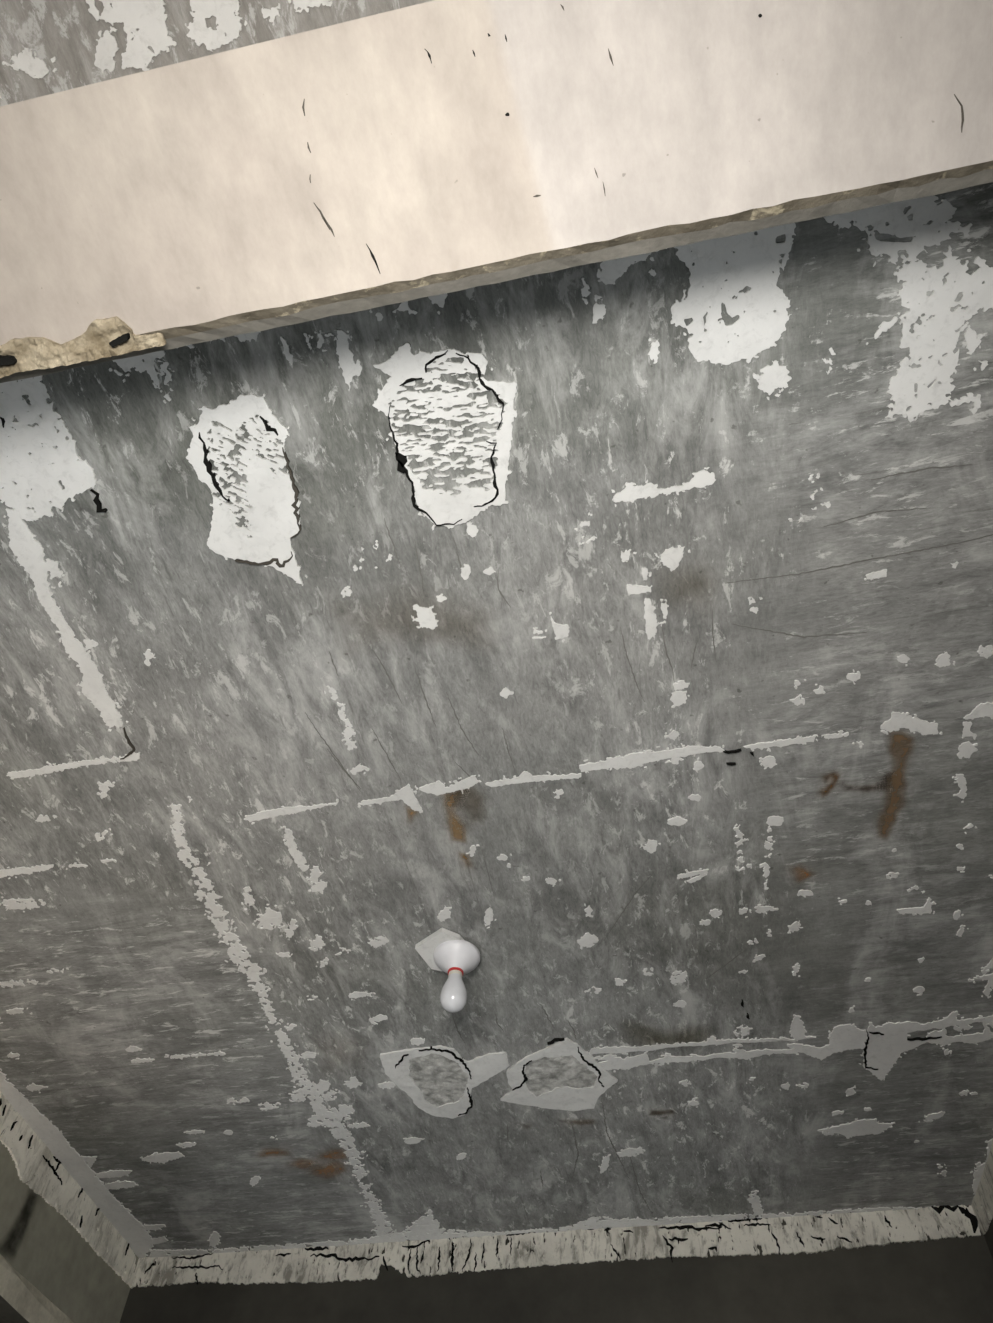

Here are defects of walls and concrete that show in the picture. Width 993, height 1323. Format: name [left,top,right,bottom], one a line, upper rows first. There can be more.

peeling [86,0,248,73]
peeling [670,223,796,400]
peeling [824,195,993,422]
peeling [0,316,175,527]
peeling [186,393,308,586]
peeling [303,329,517,537]
corrosion [445,792,468,860]
corrosion [821,733,912,837]
crack [0,1098,100,1228]
spalling [293,1038,618,1139]
peeling [0,1079,993,1289]
crack [931,1205,978,1233]